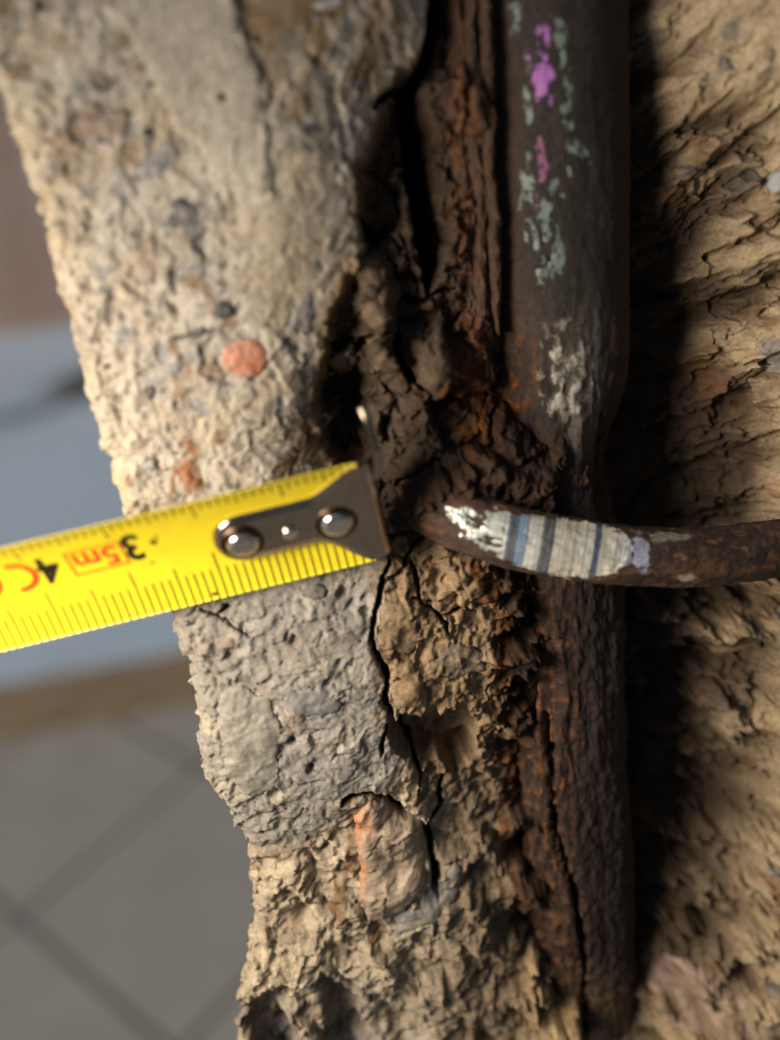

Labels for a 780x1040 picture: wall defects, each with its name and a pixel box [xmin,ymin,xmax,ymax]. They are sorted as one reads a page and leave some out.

crack [341,537,475,885]
corrosion [441,337,527,455]
corrosion [468,559,510,690]
spalling [234,0,780,1040]